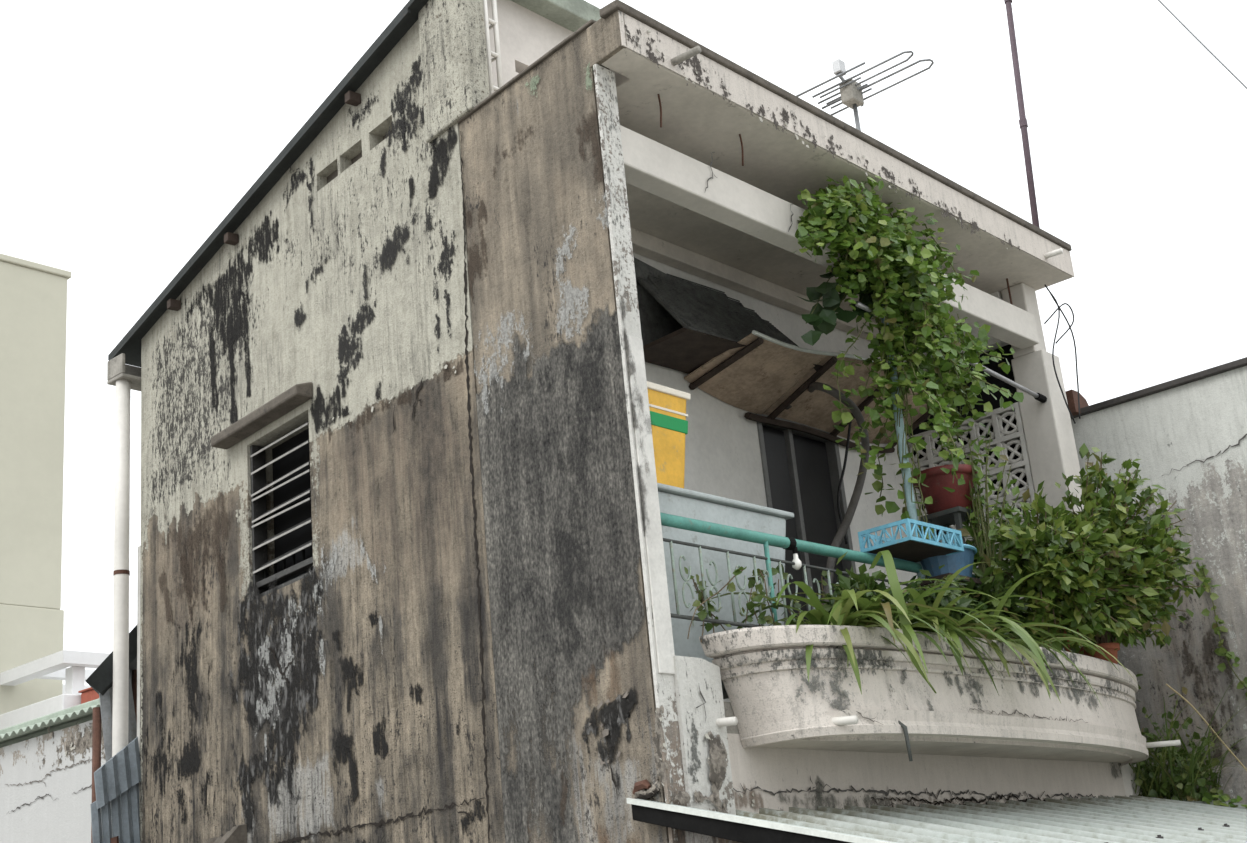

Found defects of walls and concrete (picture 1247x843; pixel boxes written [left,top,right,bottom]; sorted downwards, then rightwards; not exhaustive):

peeling [622,21,986,234]
leakage [310,55,487,434]
leakage [180,158,314,424]
leakage [294,250,335,328]
crack [1162,434,1247,476]
leakage [474,225,649,843]
leakage [143,491,364,833]
leakage [368,611,383,651]
leakage [409,683,423,704]
leakage [372,716,388,759]
crack [6,756,105,814]
leakage [452,801,485,833]